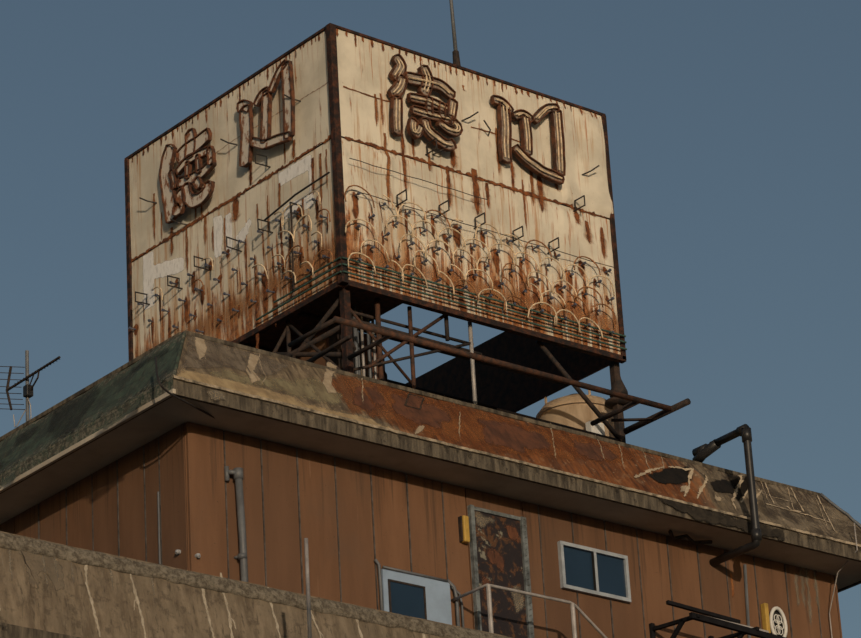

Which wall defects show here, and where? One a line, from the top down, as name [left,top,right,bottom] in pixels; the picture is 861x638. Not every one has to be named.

spalling [649,466,691,485]
spalling [710,476,748,501]